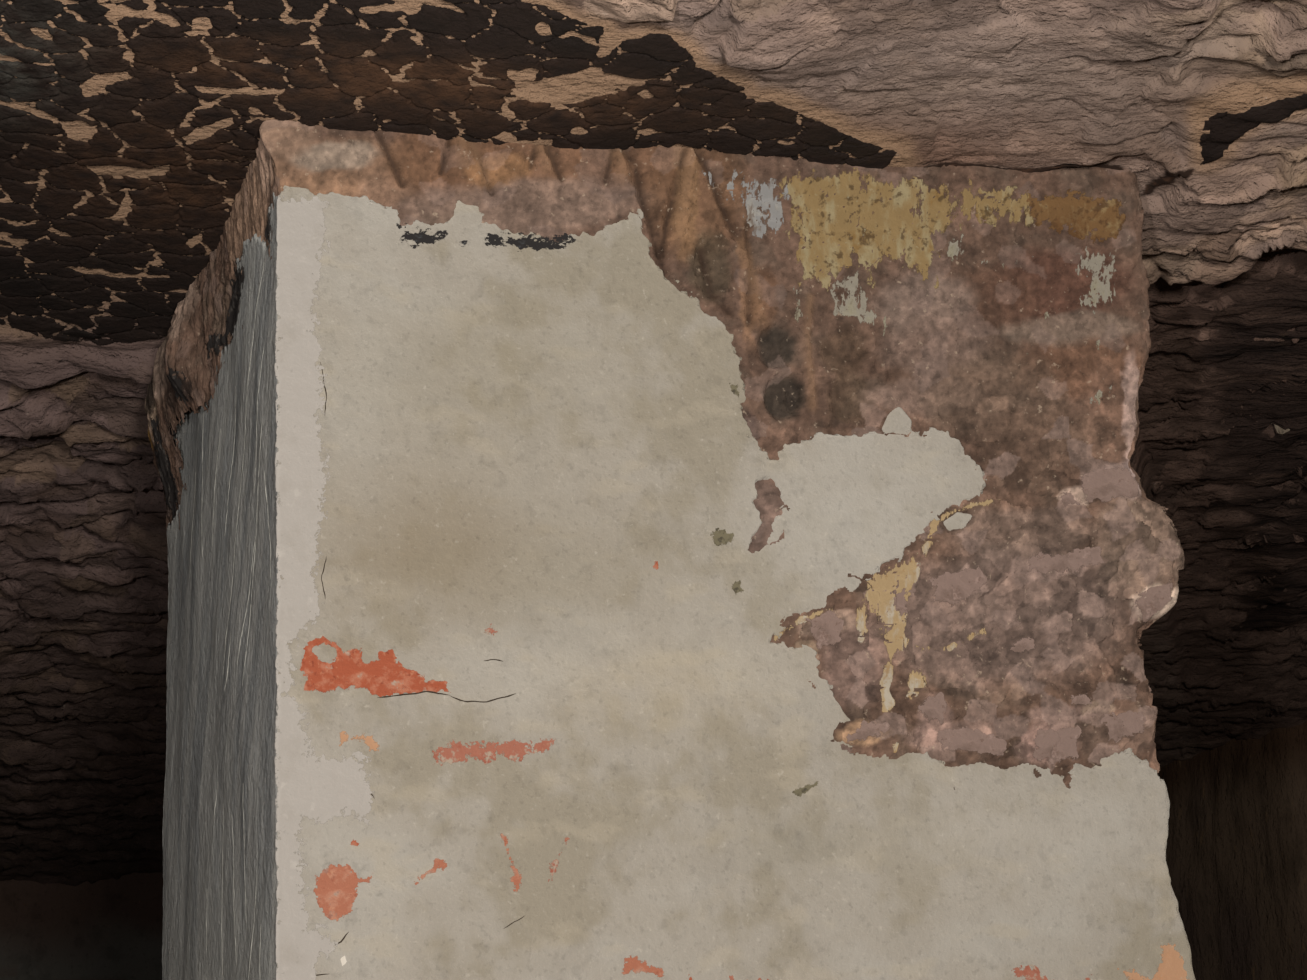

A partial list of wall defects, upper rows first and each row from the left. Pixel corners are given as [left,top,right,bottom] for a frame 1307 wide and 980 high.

water stain [396,223,467,249]
water stain [485,232,576,252]
water stain [151,261,271,690]
spalling [748,478,790,553]
spalling [770,435,1185,789]